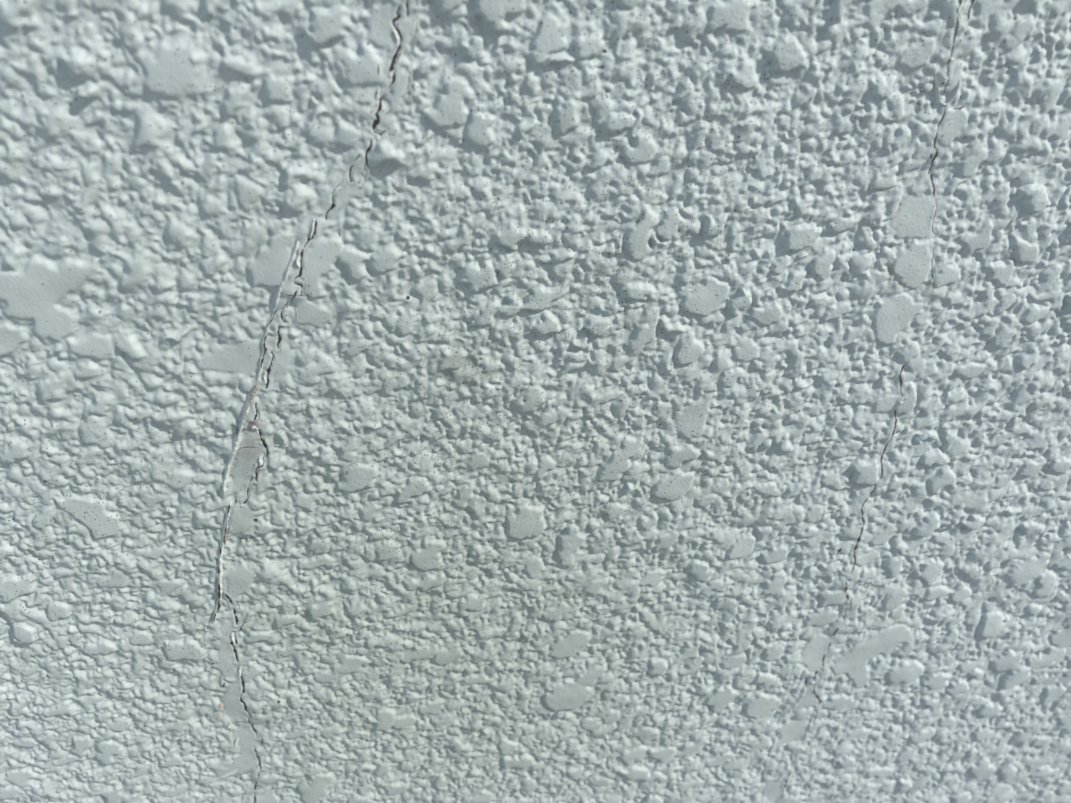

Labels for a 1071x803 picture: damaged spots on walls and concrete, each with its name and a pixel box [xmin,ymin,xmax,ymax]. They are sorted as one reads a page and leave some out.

crack [235,0,419,504]
crack [923,0,974,308]
crack [212,595,264,803]
crack [780,362,909,798]